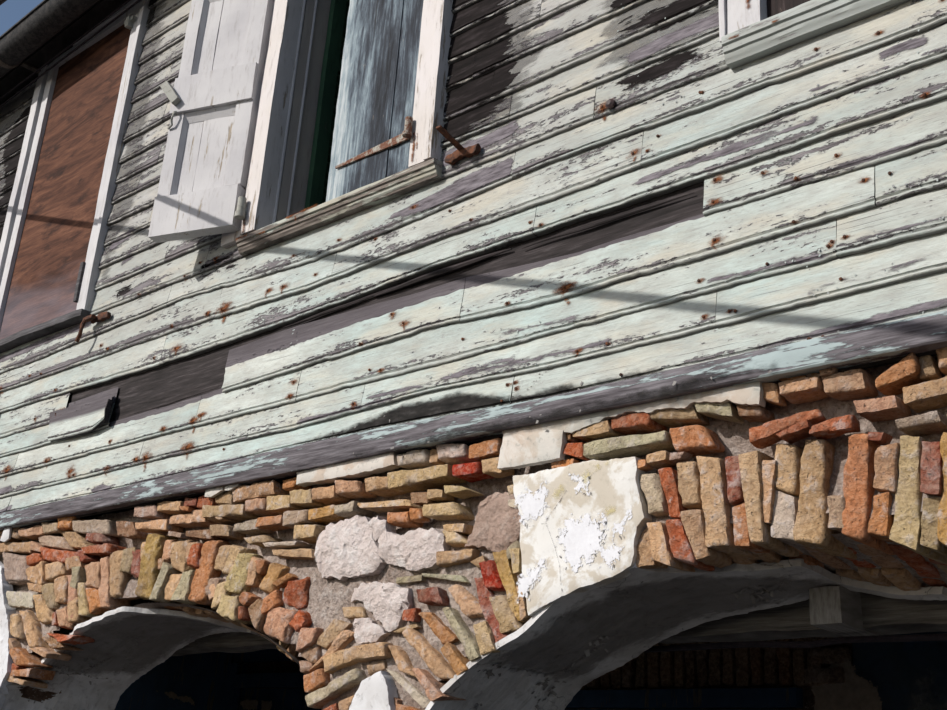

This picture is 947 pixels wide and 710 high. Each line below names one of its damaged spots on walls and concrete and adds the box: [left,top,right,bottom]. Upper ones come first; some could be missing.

peeling [610,0,719,37]
peeling [440,0,520,167]
peeling [615,48,700,93]
peeling [809,29,947,95]
peeling [0,97,33,242]
peeling [635,116,817,184]
peeling [822,134,943,177]
rust [555,281,577,304]
rust [181,412,206,455]
peeling [513,478,550,527]
peeling [555,505,633,573]
peeling [516,552,547,603]